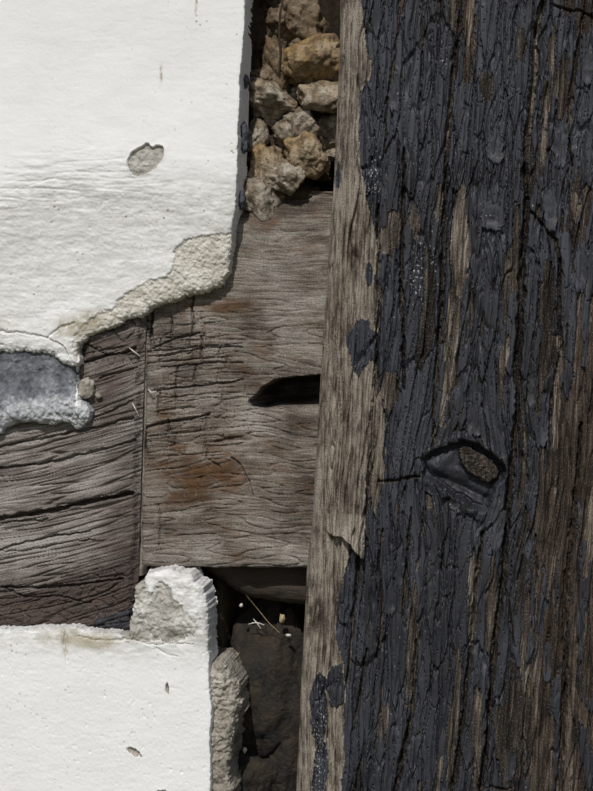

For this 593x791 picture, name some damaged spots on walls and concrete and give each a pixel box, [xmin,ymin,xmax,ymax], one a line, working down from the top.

peeling [128,144,164,177]
spalling [0,233,236,434]
crack [0,296,254,495]
peeling [310,0,593,791]
crack [0,491,135,553]
crack [0,578,125,604]
spalling [120,578,196,643]